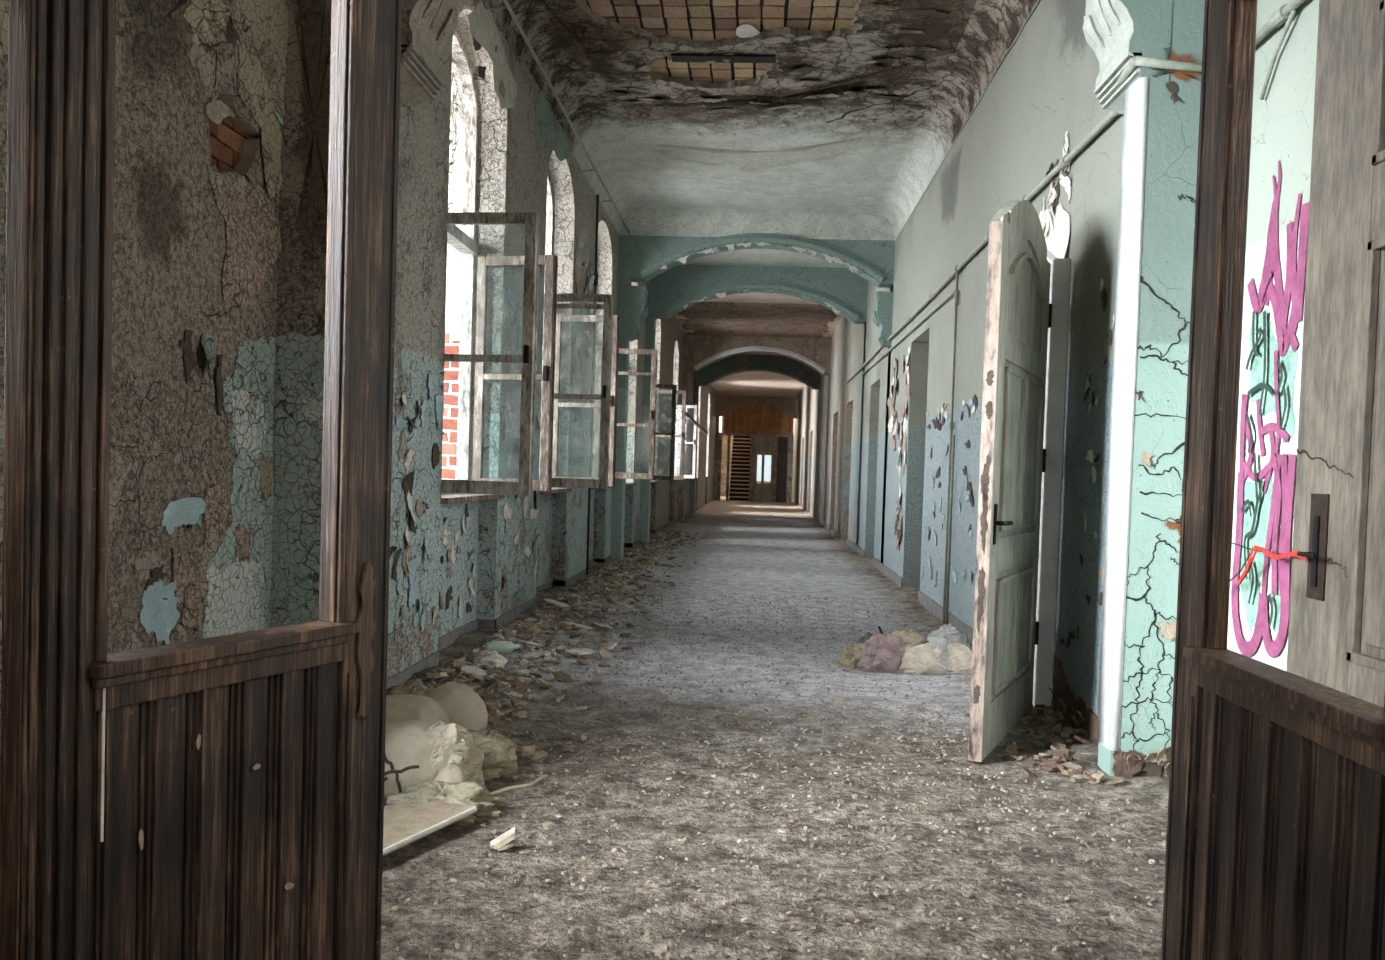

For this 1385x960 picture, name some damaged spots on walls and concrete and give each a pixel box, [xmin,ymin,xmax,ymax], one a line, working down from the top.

flaking render [203,0,288,307]
spalling [575,0,950,113]
peeling [139,330,325,645]
peeling [390,370,477,632]
peeling [503,491,539,582]
peeling [887,346,910,551]
spalling [921,221,1003,762]
crack [1122,413,1186,750]